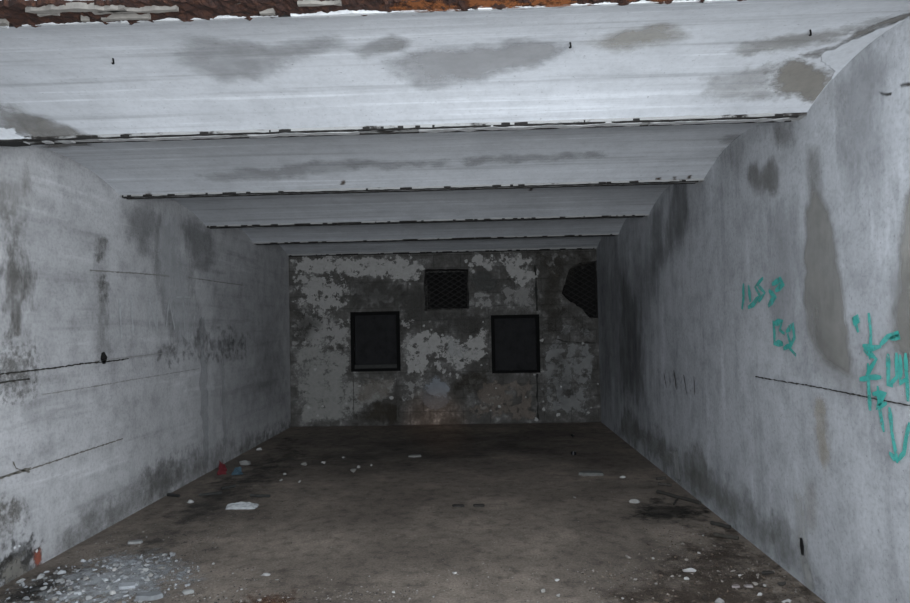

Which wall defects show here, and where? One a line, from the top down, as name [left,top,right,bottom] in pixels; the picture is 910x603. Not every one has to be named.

corrosion [390,0,459,13]
corrosion [469,0,577,9]
leakage [852,13,910,39]
leakage [404,43,556,81]
leakage [776,49,832,101]
flaking render [0,128,31,139]
peeling [464,252,539,287]
spalling [562,262,596,317]
leakage [804,191,850,373]
leakage [896,194,910,361]
peeling [290,255,488,422]
peeling [469,325,599,421]